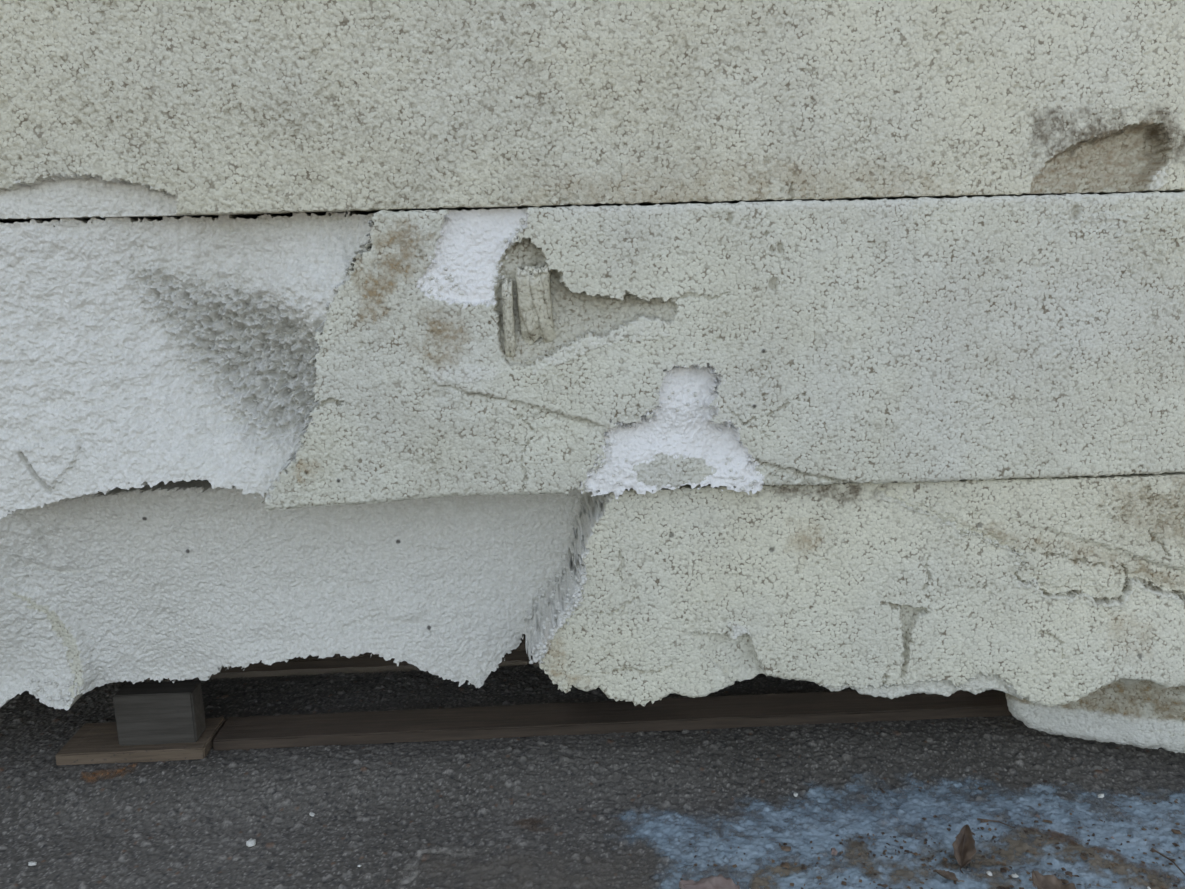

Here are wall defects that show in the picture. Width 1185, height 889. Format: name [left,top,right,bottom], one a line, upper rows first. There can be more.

spalling [0,173,767,710]
crack [881,554,934,684]
crack [1014,528,1185,604]